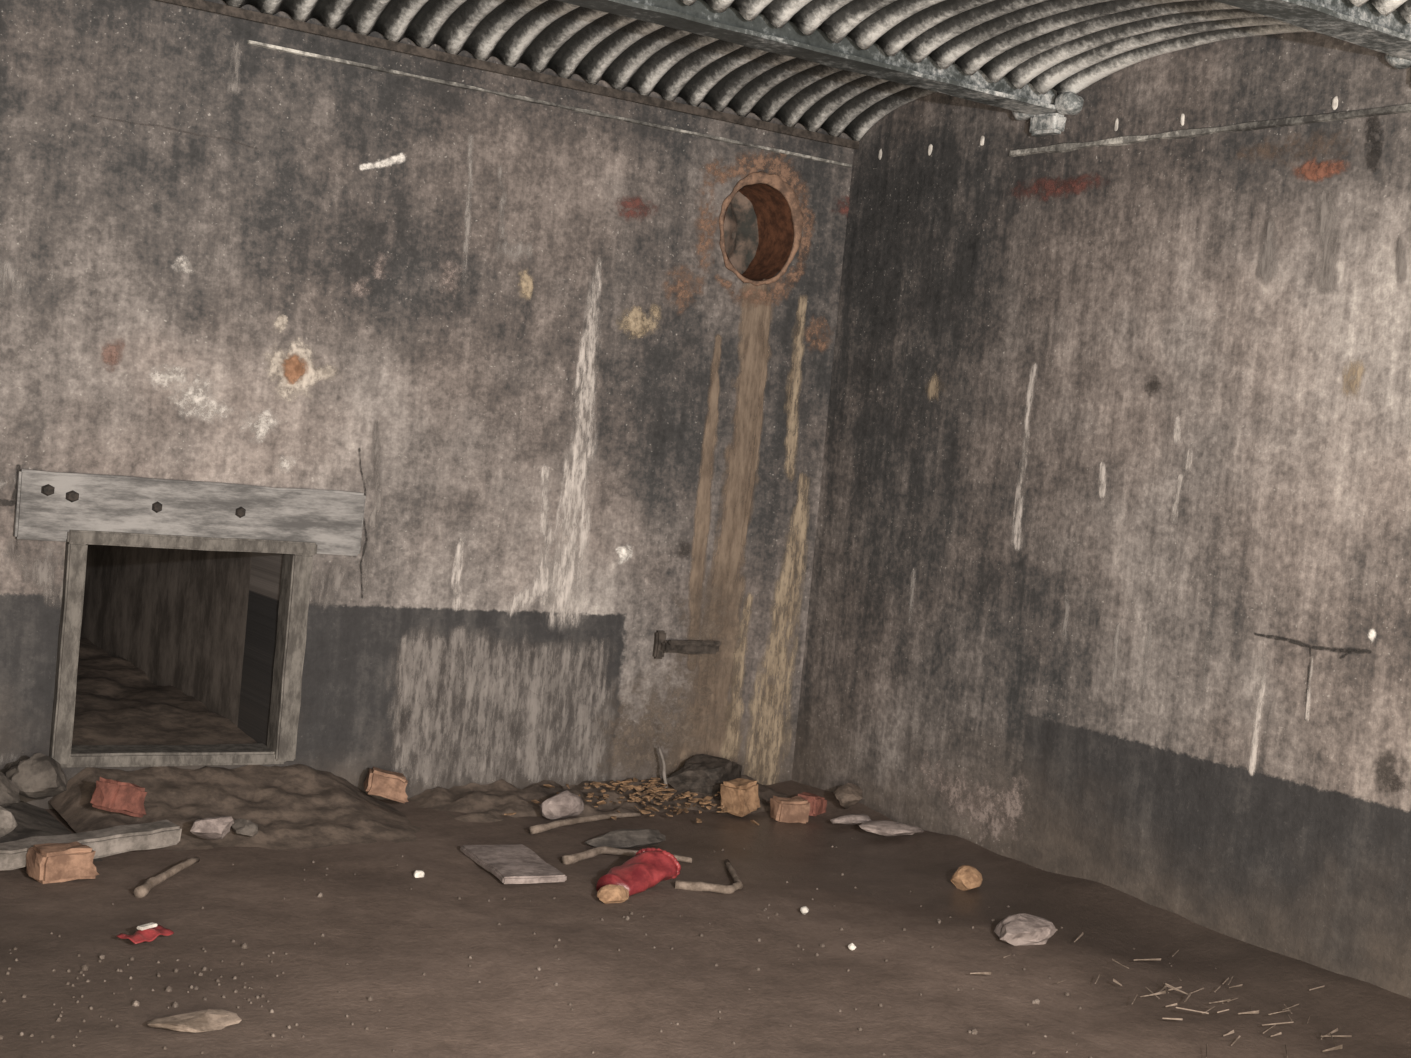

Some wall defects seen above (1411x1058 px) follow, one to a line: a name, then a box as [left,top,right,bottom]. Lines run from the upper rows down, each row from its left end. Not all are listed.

corrosion [283,355,307,384]
efflorescence [509,260,601,623]
corrosion [666,154,829,785]
efflorescence [451,538,464,609]
water stain [1249,661,1265,775]
water stain [1305,658,1313,721]
water stain [1377,751,1403,791]